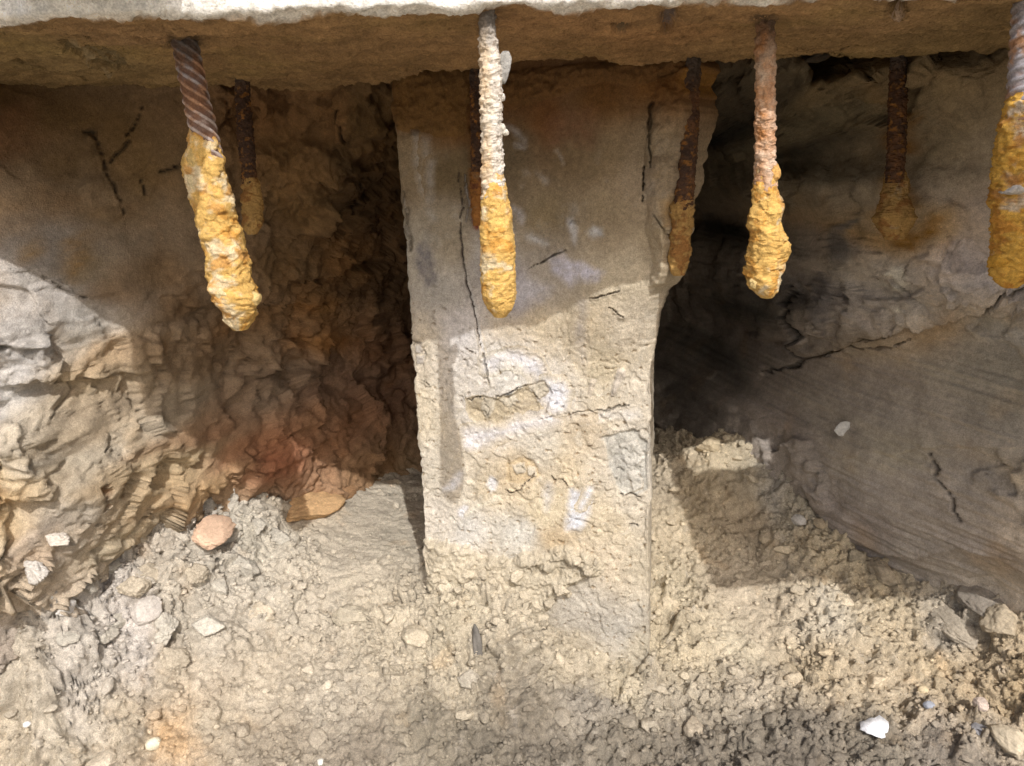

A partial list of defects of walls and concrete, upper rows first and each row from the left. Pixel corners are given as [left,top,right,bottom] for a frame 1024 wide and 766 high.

spalling [170,38,264,331]
spalling [412,339,428,368]
crack [457,172,490,402]
corrosion [471,9,503,35]
spalling [667,57,702,276]
corrosion [674,64,721,100]
spalling [742,20,792,299]
spalling [834,421,850,436]
spalling [820,55,918,274]
spalling [986,0,1024,289]